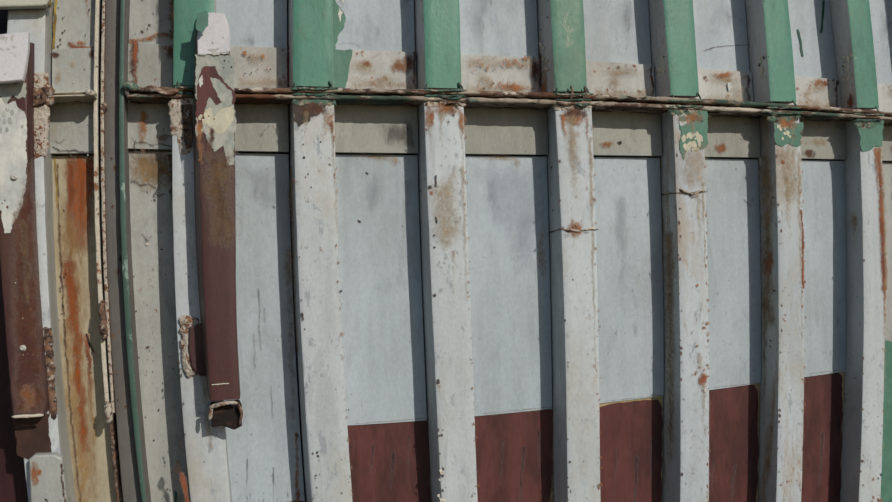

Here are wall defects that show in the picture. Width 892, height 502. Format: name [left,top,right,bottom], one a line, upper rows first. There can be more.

peeling [0,82,46,233]
rust [12,186,45,412]
rust [51,0,127,502]
rust [129,154,172,201]
rust [129,0,174,84]
peeling [195,60,236,141]
rust [301,102,335,147]
peeling [674,113,703,156]
rust [761,156,786,364]
rust [874,148,892,332]